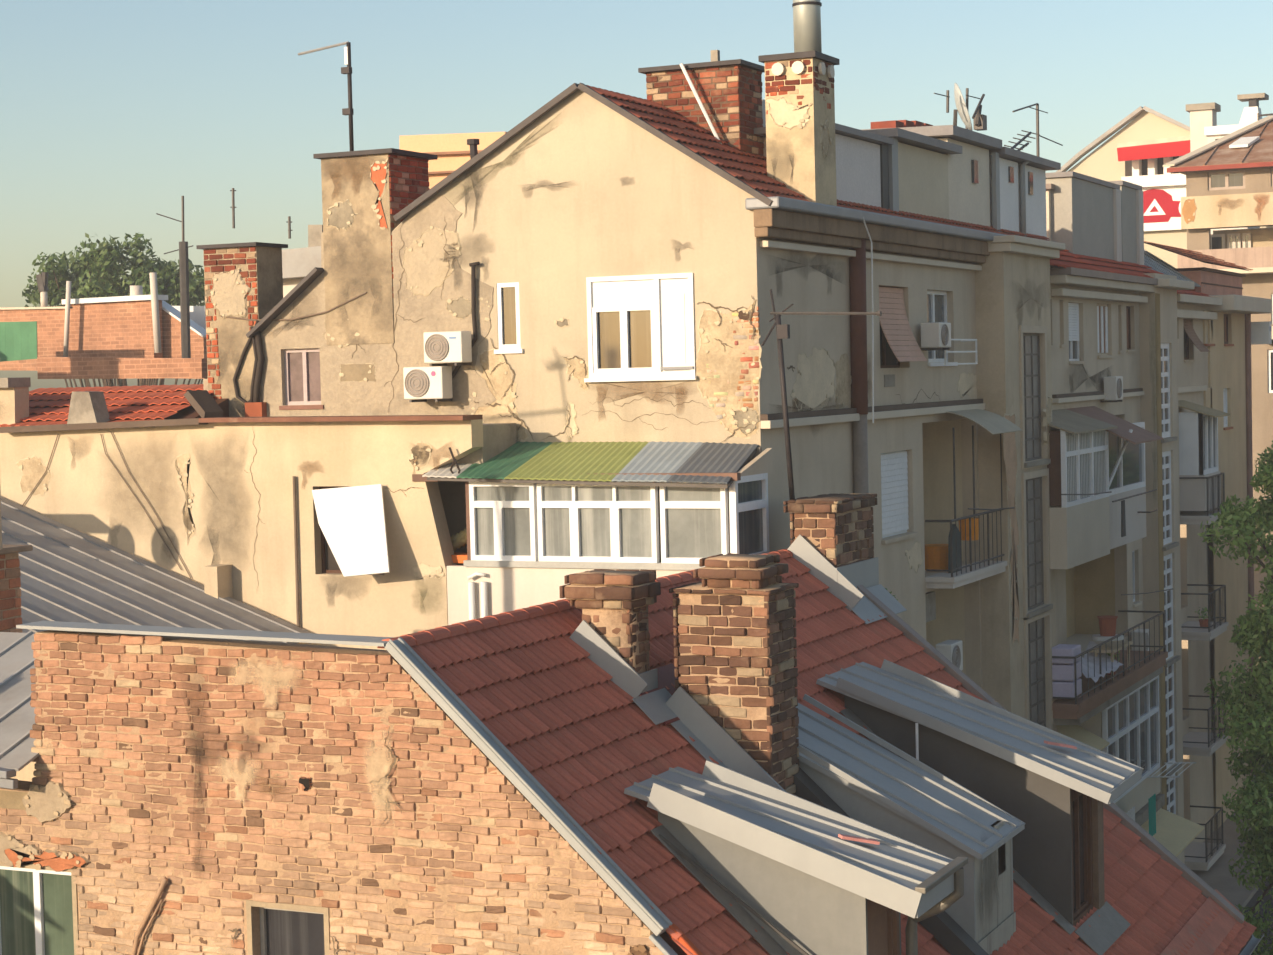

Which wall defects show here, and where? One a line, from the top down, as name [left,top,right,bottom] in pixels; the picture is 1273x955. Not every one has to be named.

spalling [764,97,813,130]
spalling [210,268,251,319]
spalling [468,348,529,442]
crack [474,338,752,442]
spalling [695,299,762,439]
spalling [790,345,852,411]
crack [247,428,265,583]
spalling [22,781,76,824]
spalling [0,831,91,872]